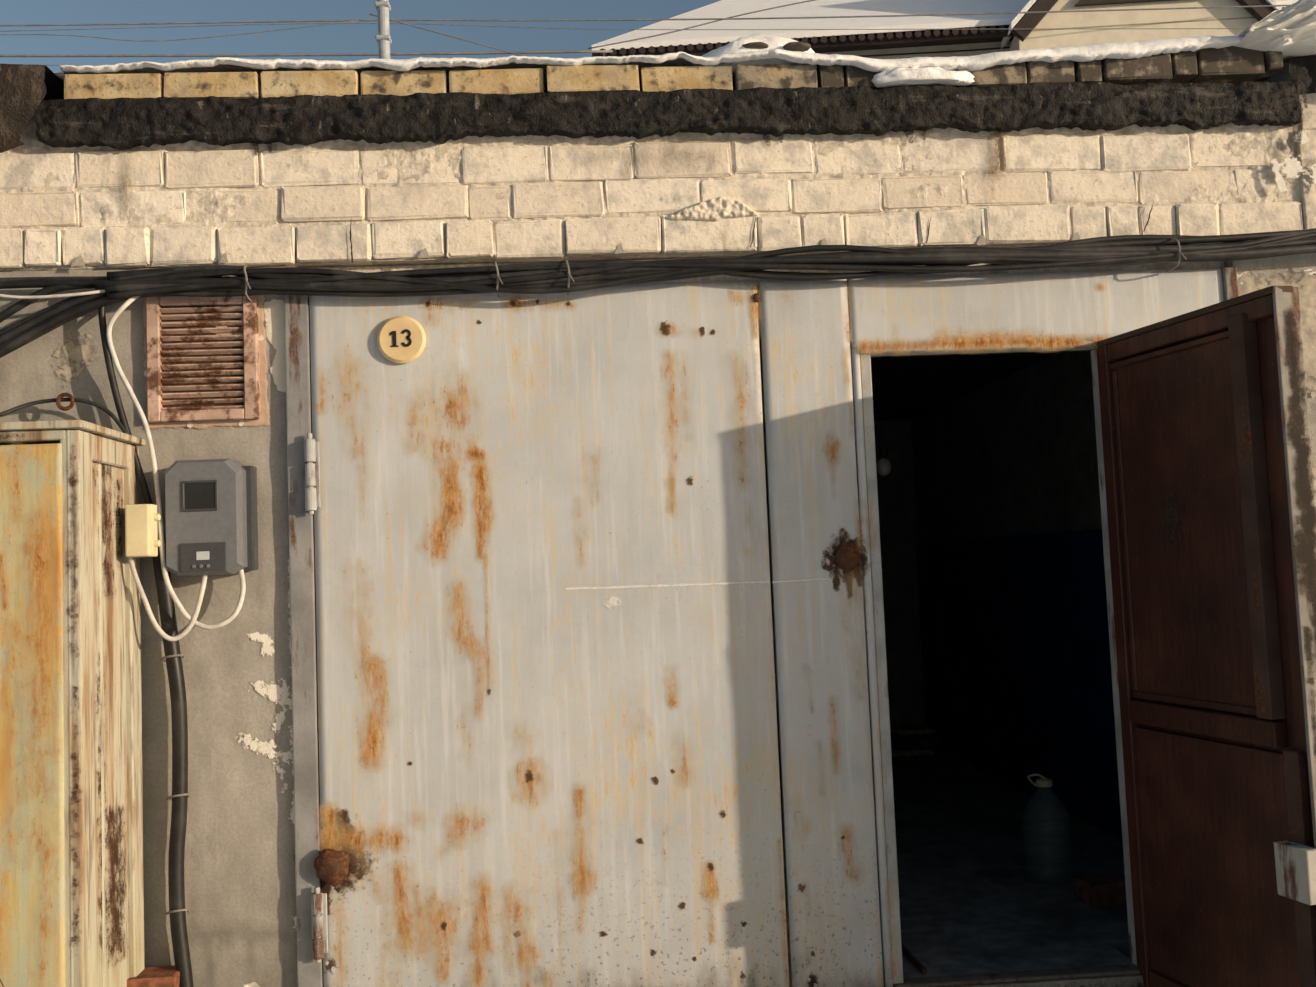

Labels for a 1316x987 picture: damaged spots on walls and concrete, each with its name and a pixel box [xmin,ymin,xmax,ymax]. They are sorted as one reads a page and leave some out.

peeling [1270,130,1316,193]
rust [660,322,674,336]
rust [847,325,1104,354]
peeling [1237,269,1316,409]
rust [410,375,493,567]
rust [822,507,872,597]
rust [1284,308,1316,754]
peeling [245,632,275,656]
peeling [235,677,293,793]
rust [356,645,388,769]
rust [319,806,552,987]
rust [703,863,719,897]